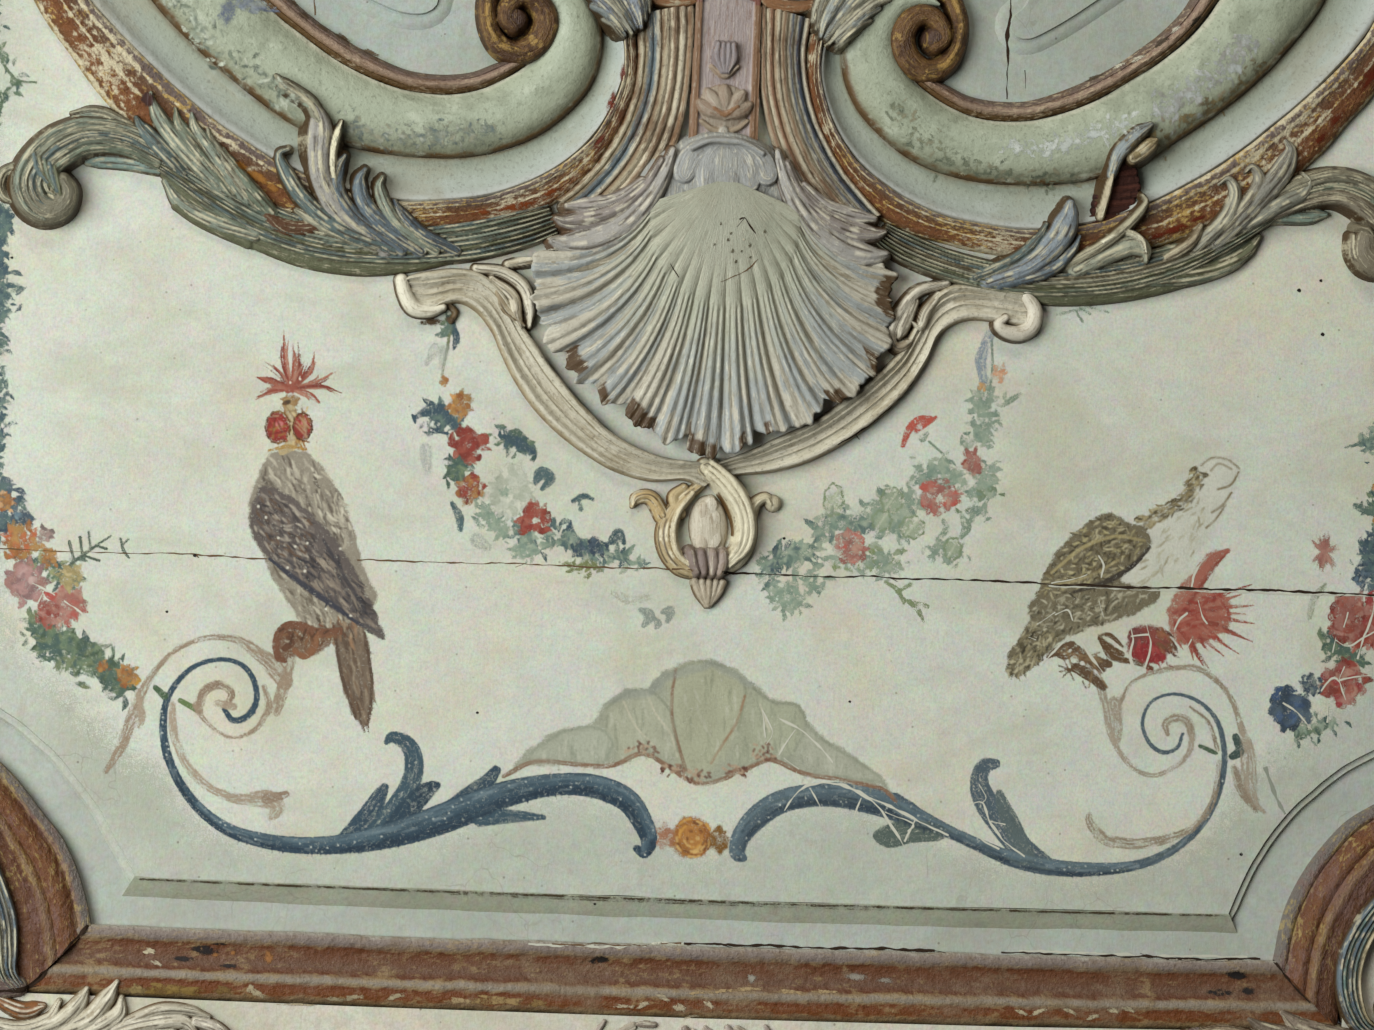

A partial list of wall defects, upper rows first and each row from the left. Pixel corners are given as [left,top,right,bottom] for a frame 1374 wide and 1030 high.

peeling [291,0,379,57]
crack [1005,0,1026,99]
crack [0,548,267,560]
crack [357,559,1374,598]